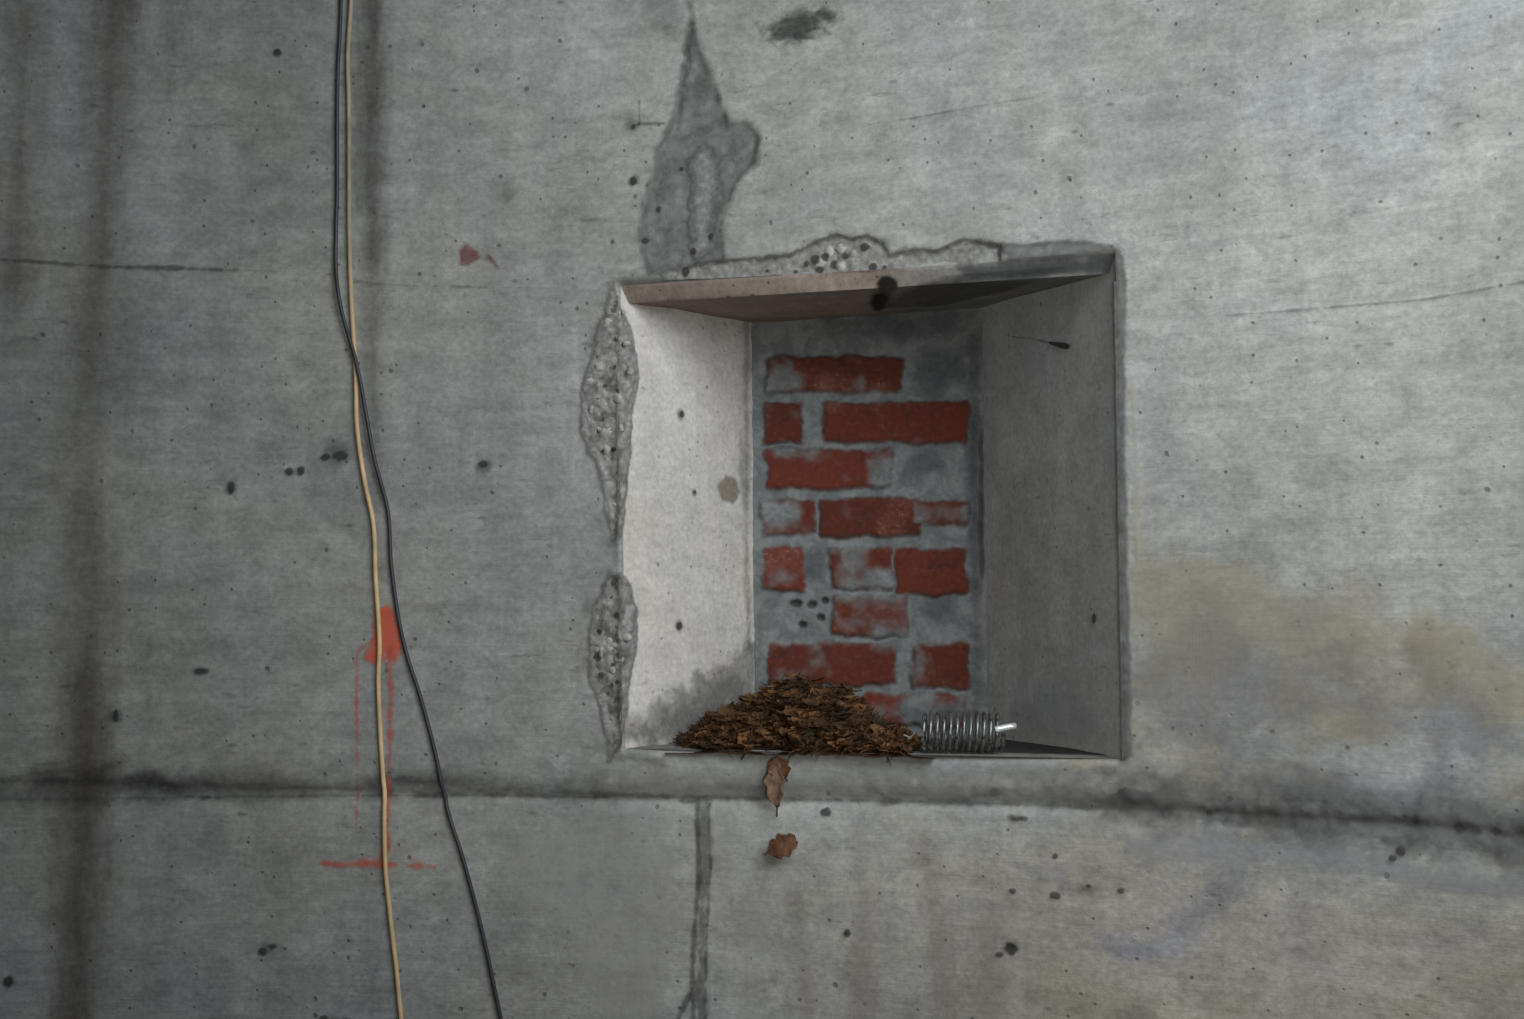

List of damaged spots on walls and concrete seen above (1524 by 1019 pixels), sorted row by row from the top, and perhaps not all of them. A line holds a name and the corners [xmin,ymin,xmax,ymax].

spalling [580,289,640,540]
peeling [630,31,1132,759]
spalling [588,574,638,761]